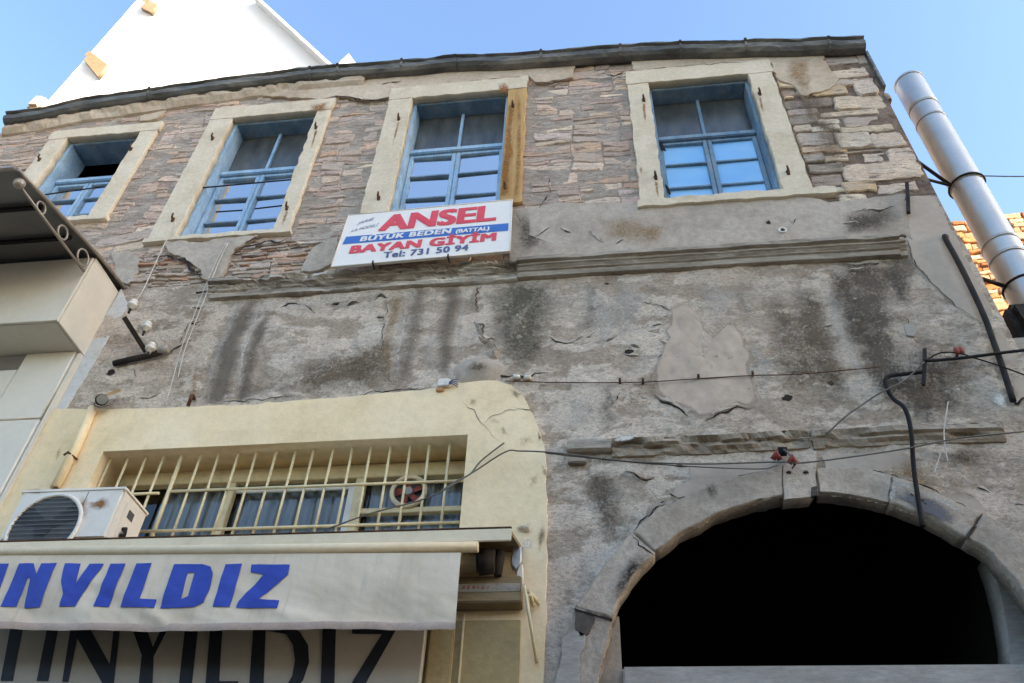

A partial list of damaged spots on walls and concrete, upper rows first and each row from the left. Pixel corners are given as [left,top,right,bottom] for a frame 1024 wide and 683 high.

flaking render [632,56,839,99]
rust [501,103,520,195]
flaking render [111,235,338,288]
damp [210,304,267,402]
damp [428,289,464,367]
damp [493,285,543,358]
flaking render [610,302,756,422]
crack [632,509,658,556]